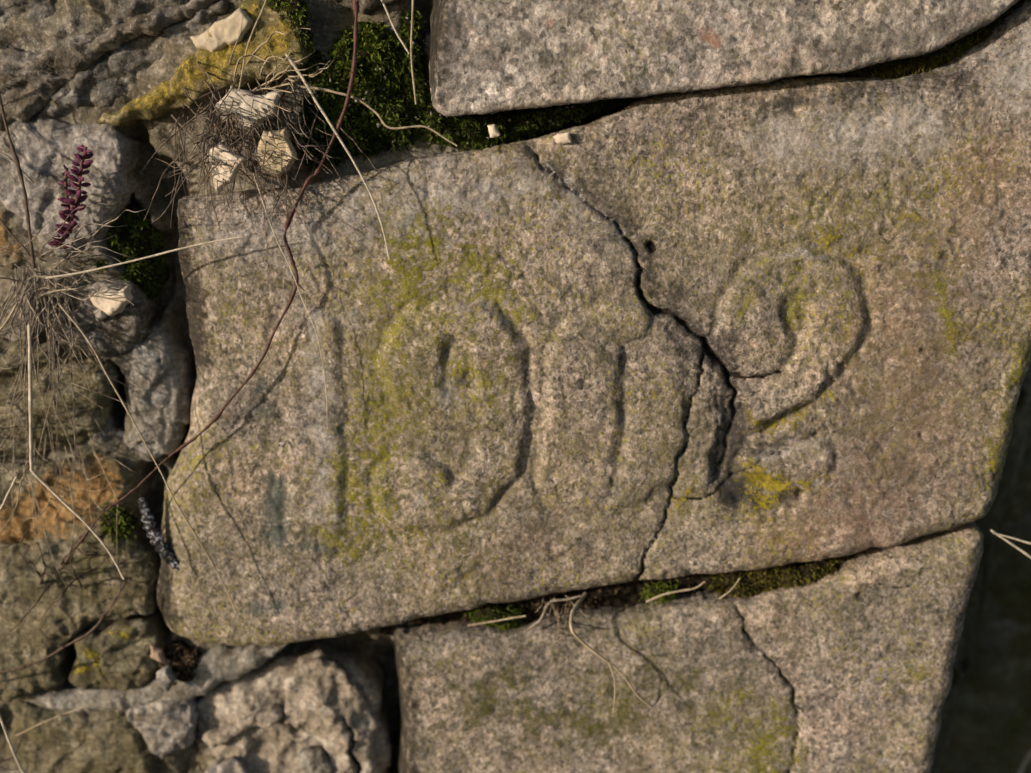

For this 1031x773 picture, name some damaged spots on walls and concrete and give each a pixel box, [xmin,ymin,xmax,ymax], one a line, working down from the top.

crack [591,206,789,578]
crack [736,606,815,773]